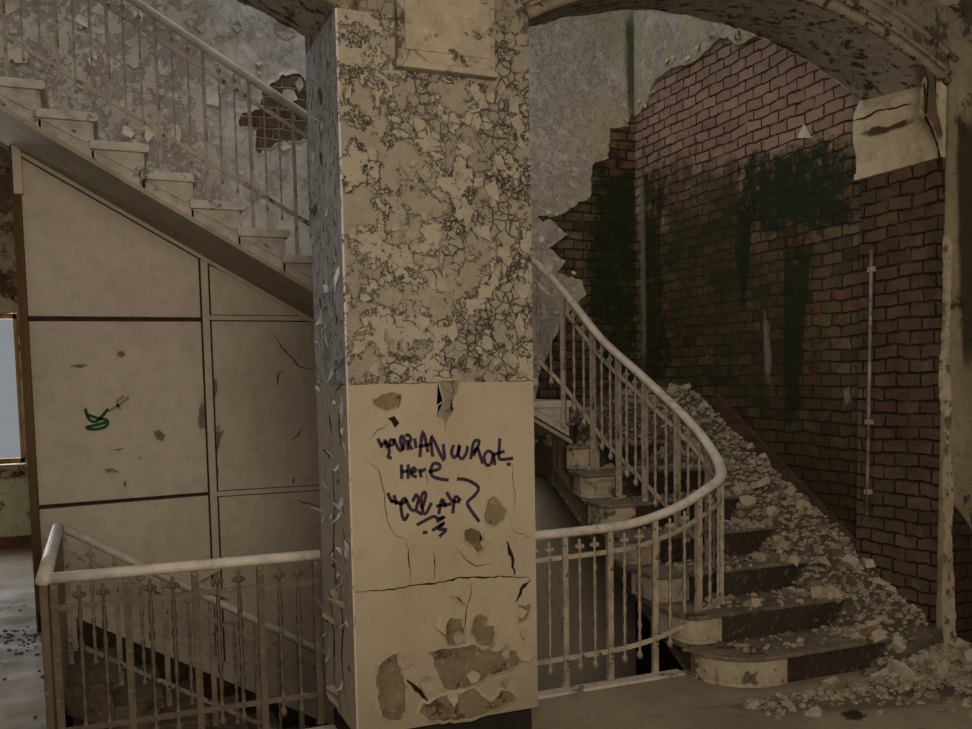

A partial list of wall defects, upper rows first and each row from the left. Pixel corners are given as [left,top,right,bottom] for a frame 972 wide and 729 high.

flaking render [236,57,325,158]
peeling [469,81,525,150]
peeling [411,142,513,278]
crack [275,337,313,387]
peeling [435,378,461,433]
peeling [466,312,524,369]
peeling [938,236,972,647]
crack [293,470,346,692]
peeling [310,497,349,637]
crack [363,422,532,629]
crack [407,680,428,701]
flaking render [373,593,535,725]